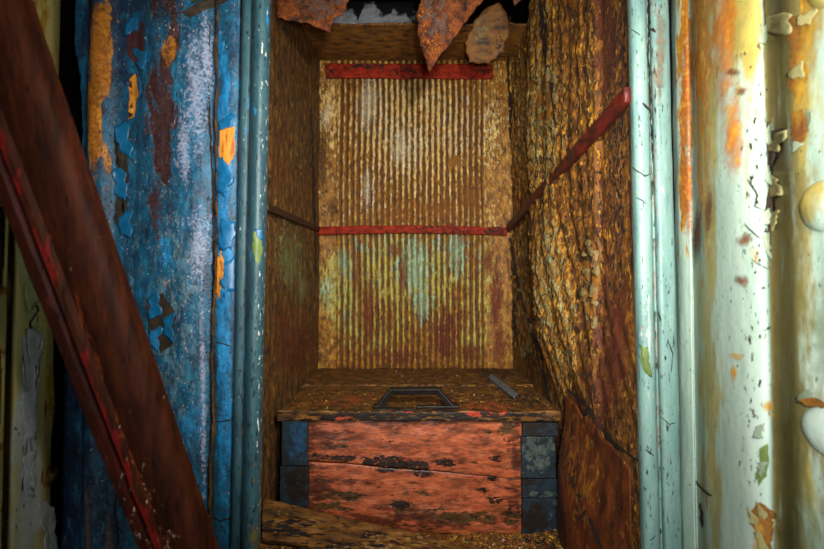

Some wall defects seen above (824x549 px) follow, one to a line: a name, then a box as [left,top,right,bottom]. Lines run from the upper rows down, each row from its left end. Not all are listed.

rust [717,0,738,96]
peeling [111,14,147,237]
peeling [214,114,236,196]
rust [680,12,712,253]
rust [722,105,741,165]
peeling [758,0,818,261]
peeling [217,218,237,298]
rust [483,250,504,362]